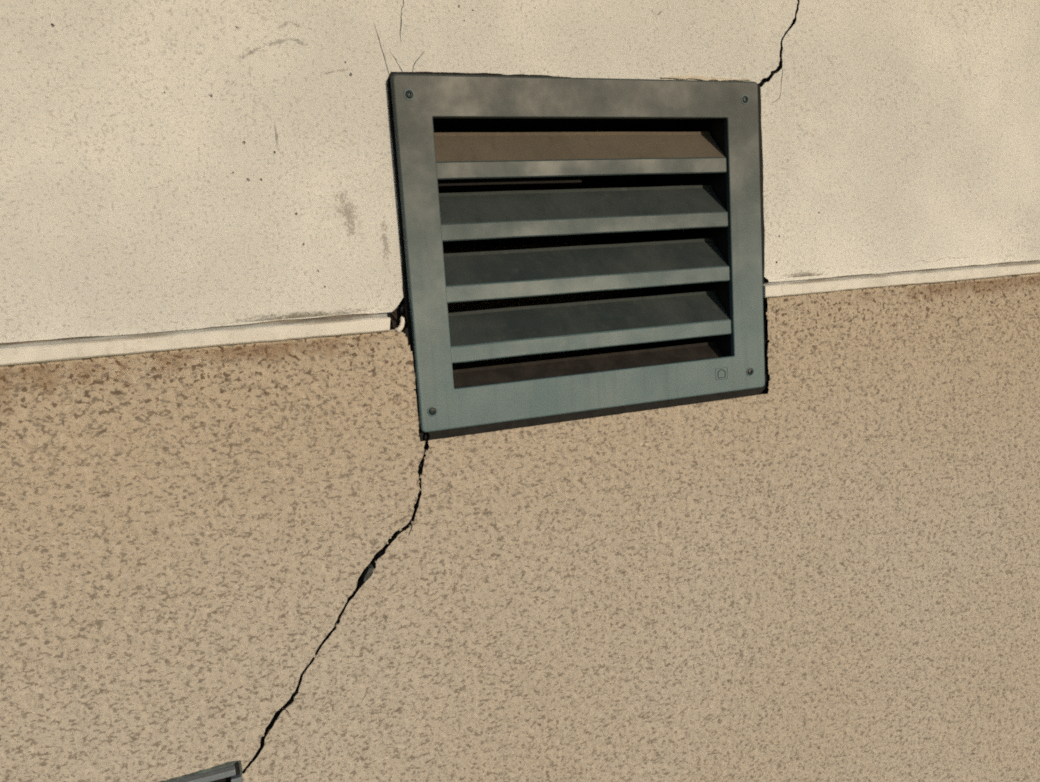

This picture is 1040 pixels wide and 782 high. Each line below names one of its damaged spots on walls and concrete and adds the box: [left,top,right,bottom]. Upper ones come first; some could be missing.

crack [758,0,800,103]
crack [243,432,430,773]